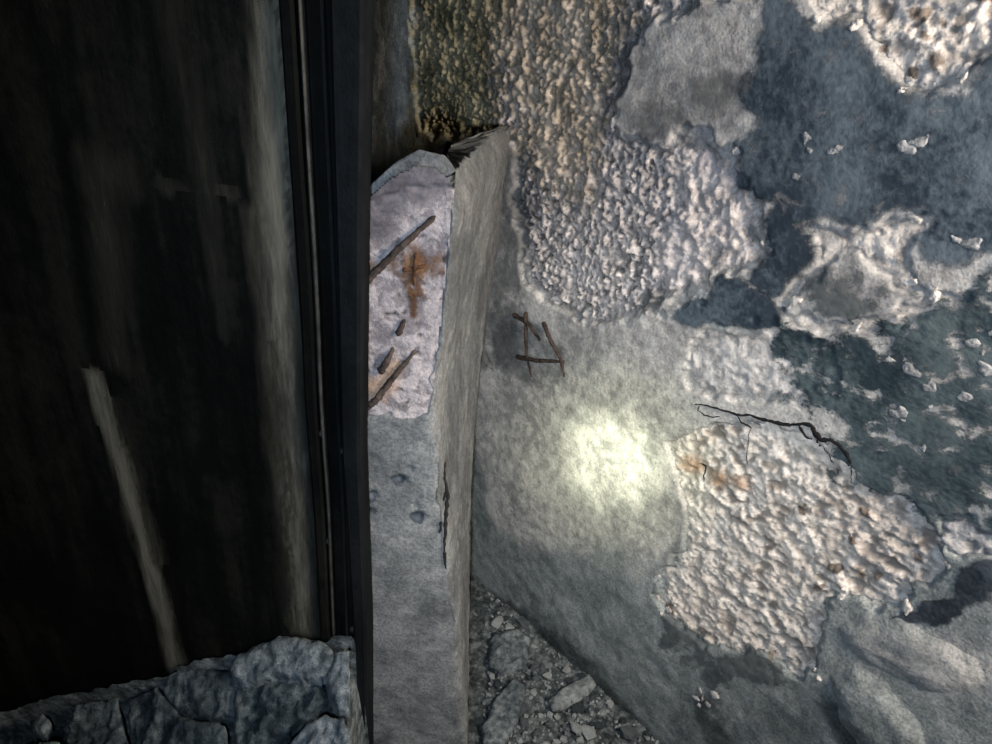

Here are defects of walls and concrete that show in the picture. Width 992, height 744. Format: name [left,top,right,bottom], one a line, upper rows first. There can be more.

spalling [813,0,992,93]
spalling [441,0,765,321]
flaking render [896,134,929,155]
spalling [368,187,454,419]
rust [390,246,445,318]
spalling [824,213,928,288]
flaking render [949,235,992,250]
spalling [691,328,833,398]
flaking render [884,354,937,392]
flaking render [956,330,992,377]
crack [695,404,852,482]
spalling [657,422,992,682]